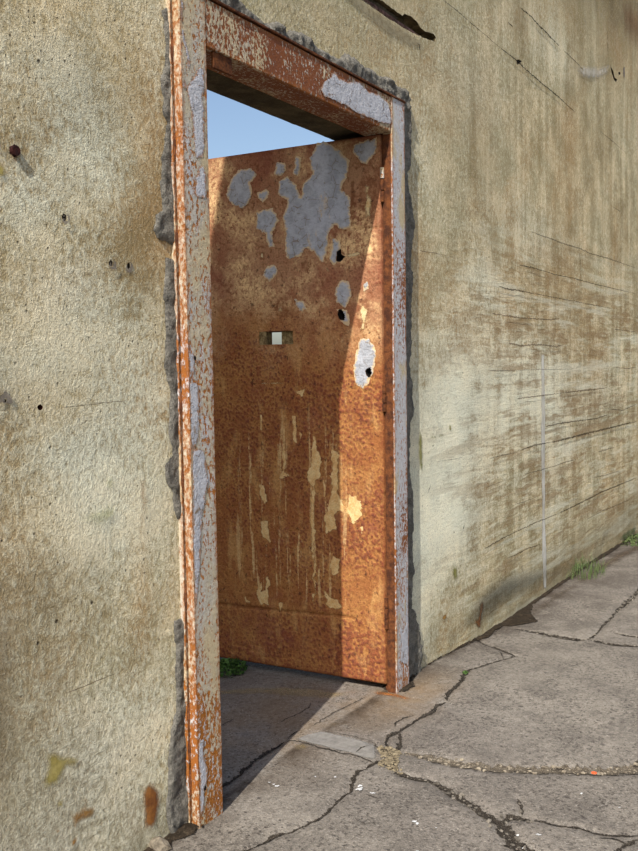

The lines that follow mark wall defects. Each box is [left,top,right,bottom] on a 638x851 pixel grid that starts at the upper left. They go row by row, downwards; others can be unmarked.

spalling [351,0,436,45]
crack [446,2,580,111]
crack [492,232,635,347]
crack [518,388,604,399]
crack [493,405,636,458]
crack [487,471,635,558]
corrosion [144,785,158,827]